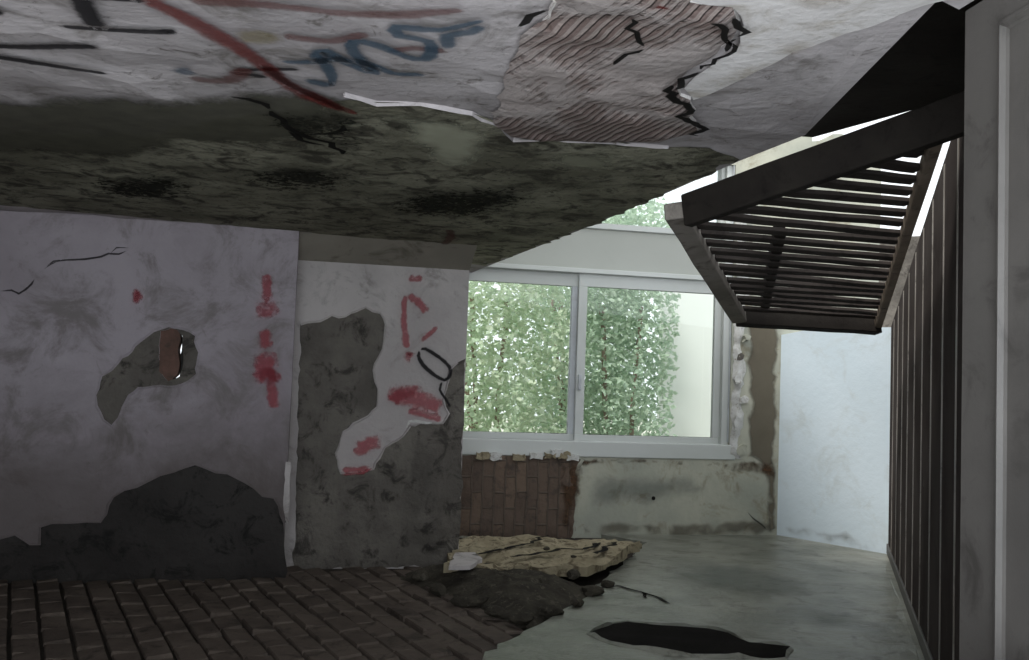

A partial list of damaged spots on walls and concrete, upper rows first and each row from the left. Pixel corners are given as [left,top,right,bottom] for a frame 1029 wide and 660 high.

peeling [0,0,944,266]
damp [91,174,201,202]
damp [235,166,350,193]
damp [393,187,534,218]
crack [3,247,125,294]
flaking render [729,323,751,459]
flaking render [0,306,584,583]